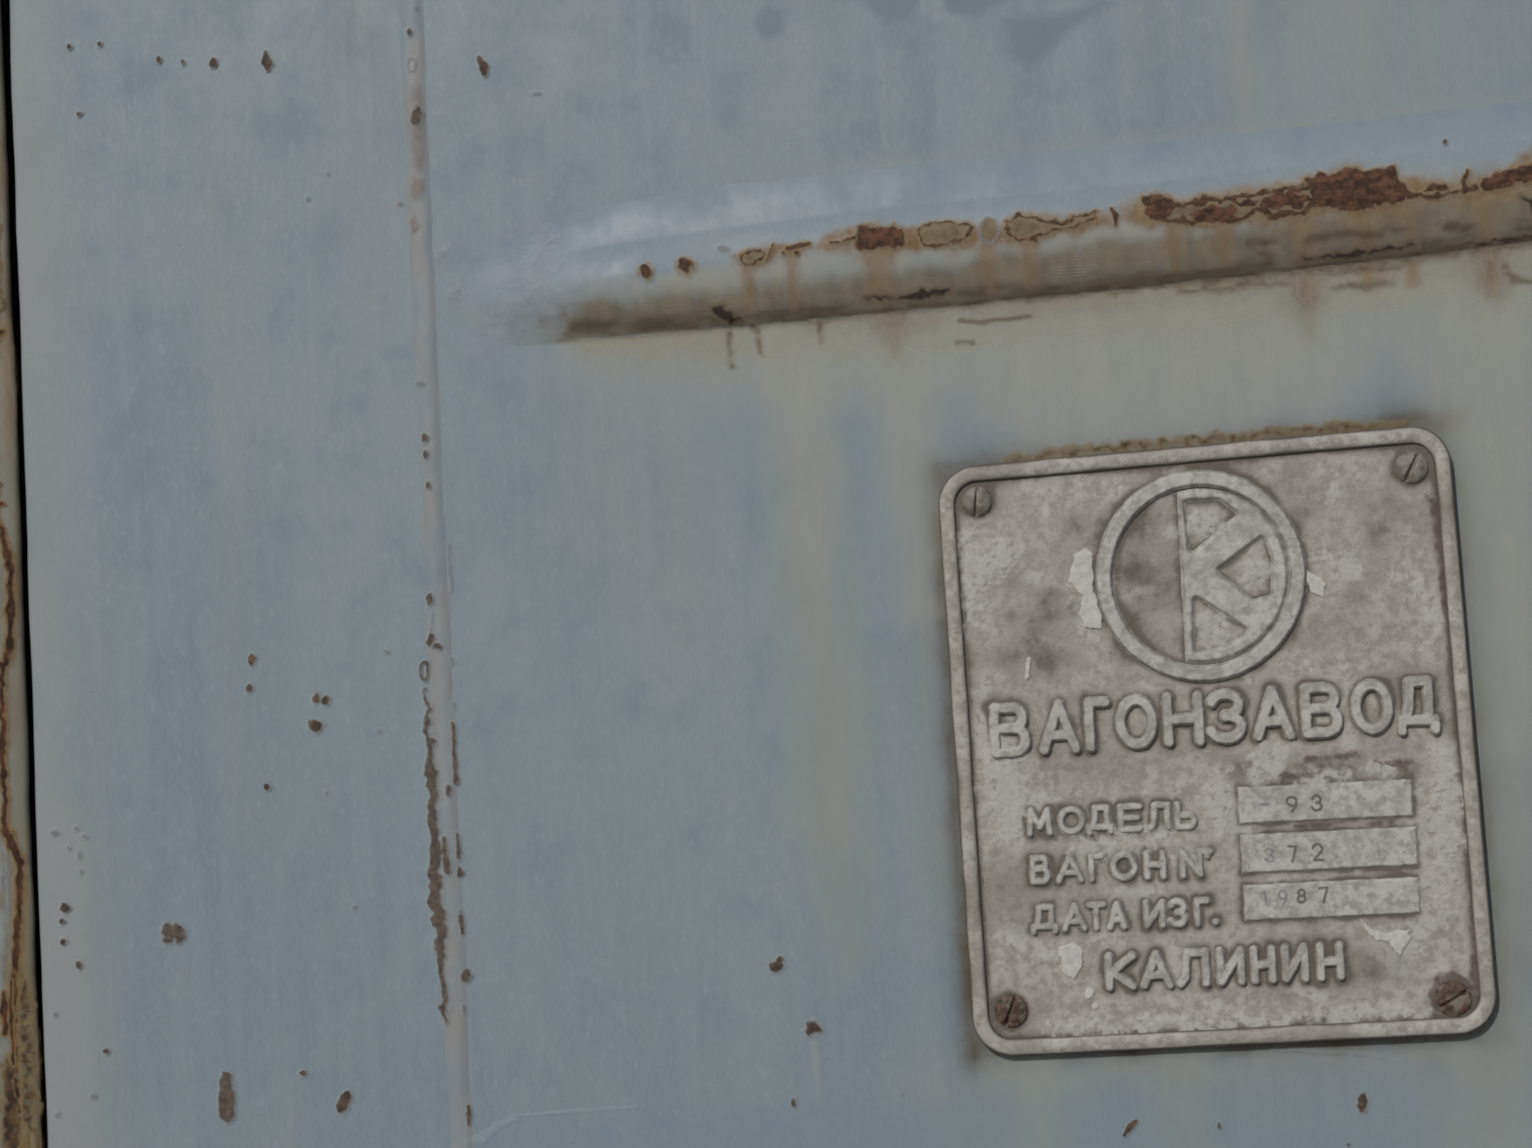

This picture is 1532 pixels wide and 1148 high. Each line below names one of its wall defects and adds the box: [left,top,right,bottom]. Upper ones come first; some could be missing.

corrosion [261,50,273,71]
corrosion [536,154,1532,356]
corrosion [0,599,16,667]
corrosion [419,630,472,1024]
corrosion [161,922,186,944]
corrosion [0,889,58,1148]
corrosion [218,1071,235,1123]
corrosion [336,1090,351,1113]